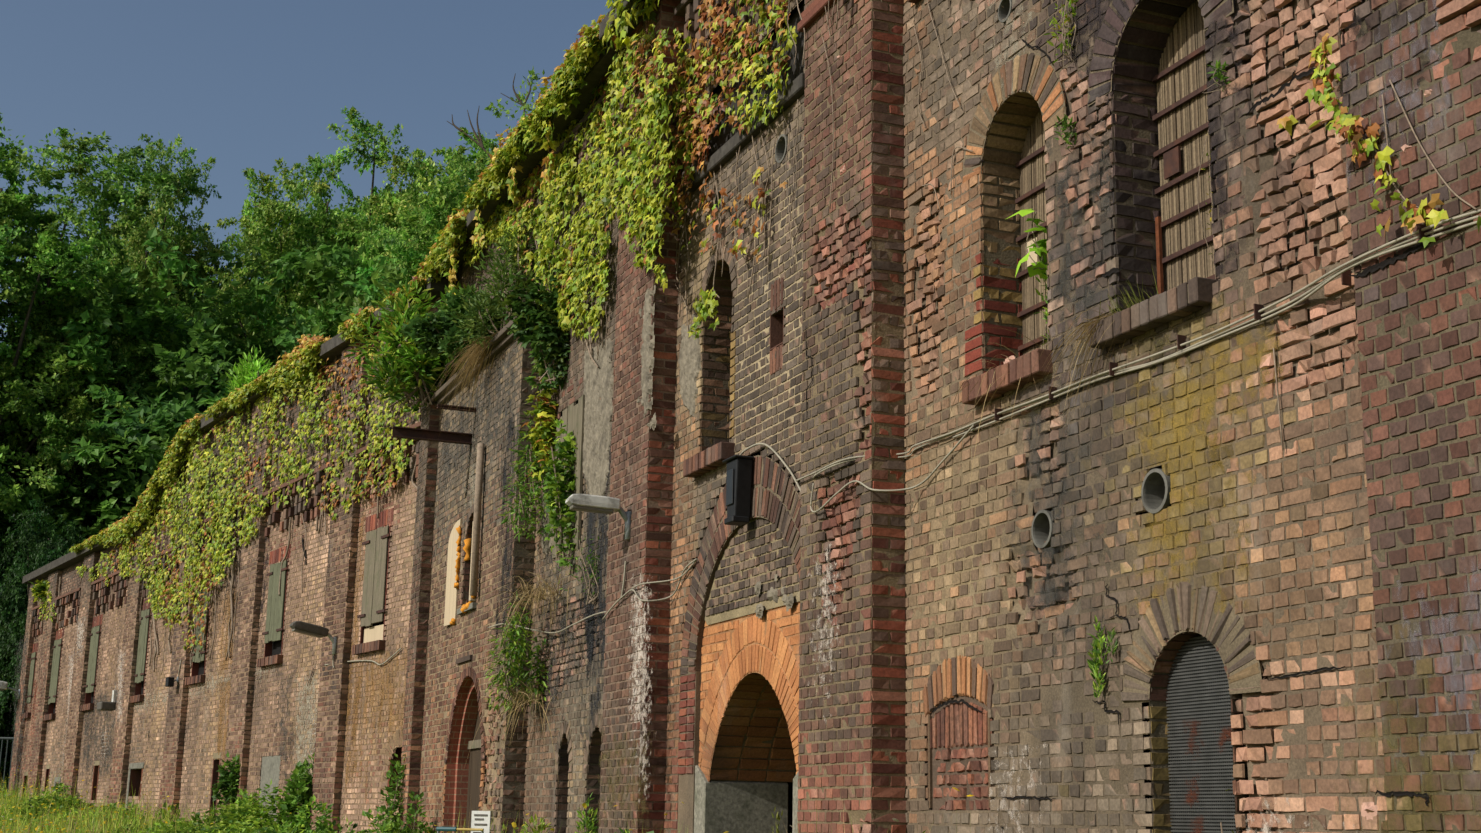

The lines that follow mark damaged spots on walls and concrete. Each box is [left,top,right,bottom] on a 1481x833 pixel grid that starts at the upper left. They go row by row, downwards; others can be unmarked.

water stain [629,573,652,801]